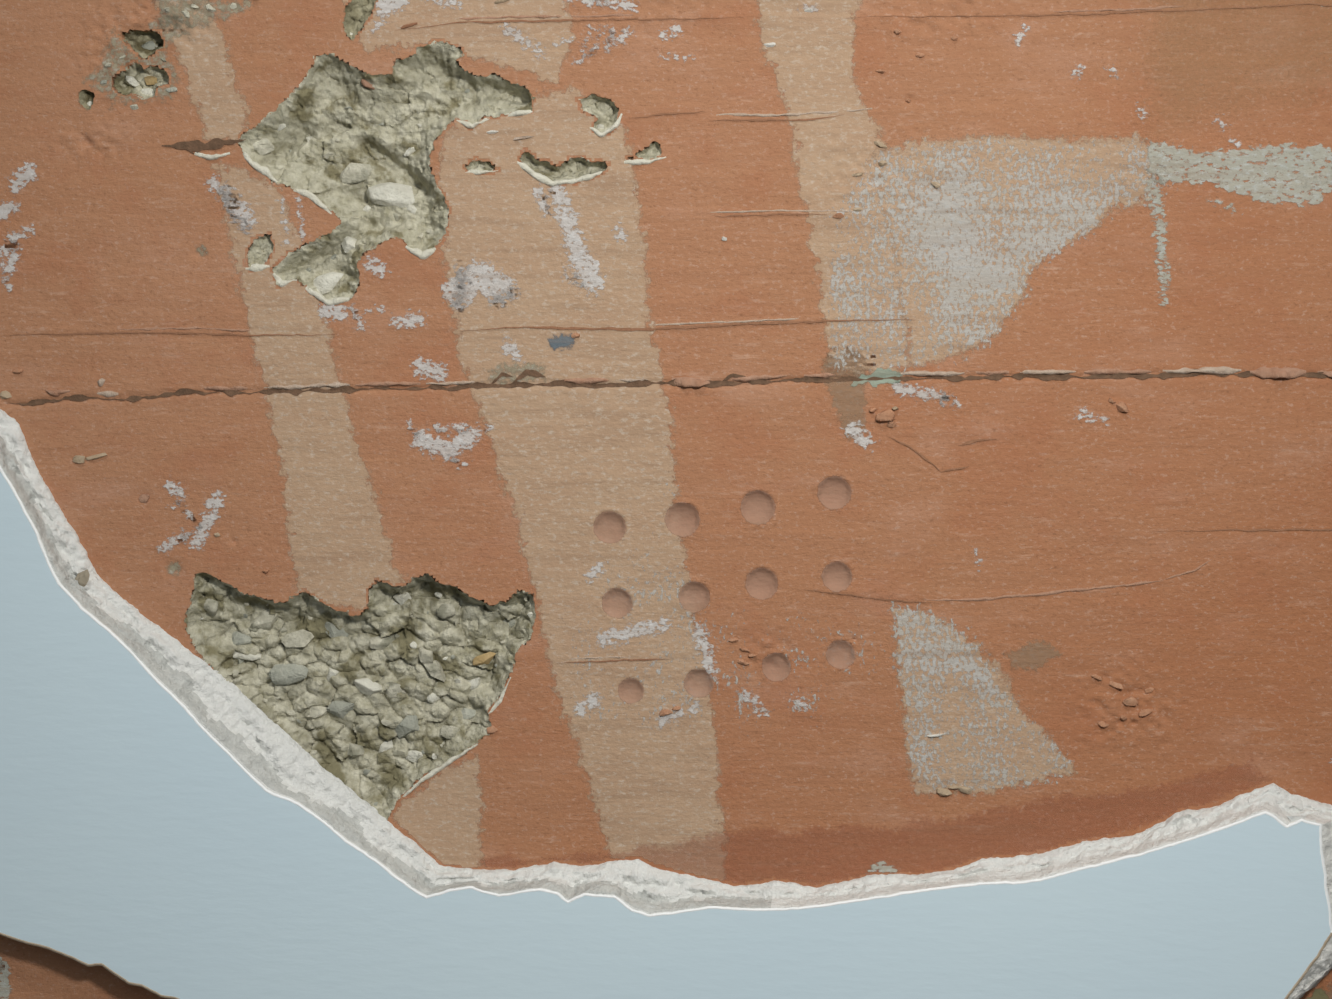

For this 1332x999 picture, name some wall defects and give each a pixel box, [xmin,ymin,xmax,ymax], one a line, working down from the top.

peeling [342,0,377,41]
spalling [113,30,169,100]
spalling [78,89,94,110]
peeling [578,94,622,137]
spalling [238,40,536,306]
peeling [517,150,608,186]
peeling [624,142,666,165]
crack [4,326,331,336]
crack [465,318,910,331]
crack [11,366,1332,406]
spalling [0,409,1332,999]